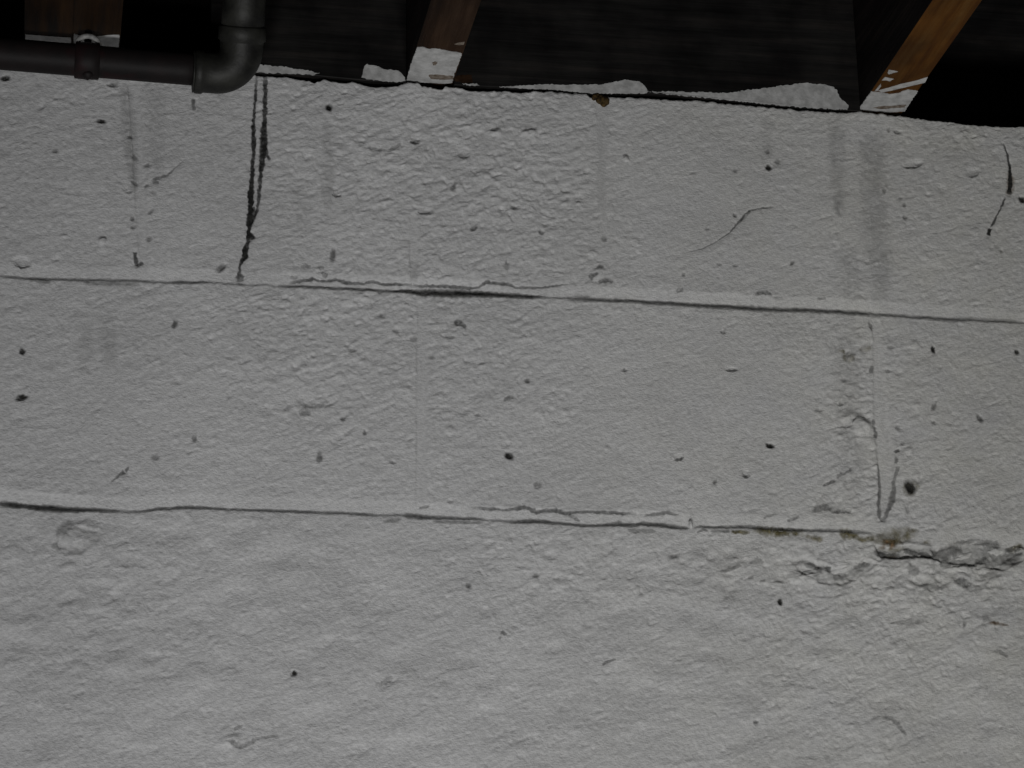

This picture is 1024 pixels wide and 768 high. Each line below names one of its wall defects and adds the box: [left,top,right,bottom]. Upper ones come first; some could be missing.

crack [237,80,270,279]
crack [987,147,1012,236]
crack [382,281,533,299]
crack [7,503,101,513]
spalling [799,563,852,579]
spalling [943,548,1020,573]